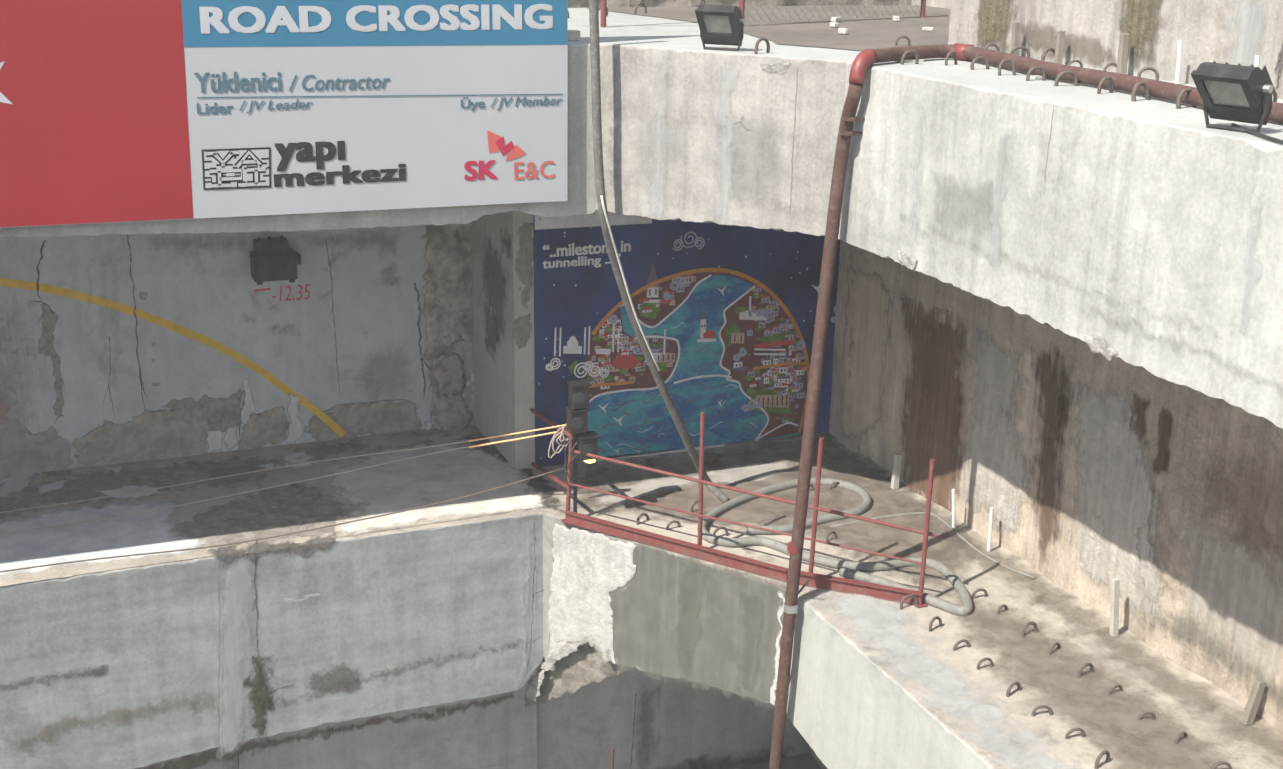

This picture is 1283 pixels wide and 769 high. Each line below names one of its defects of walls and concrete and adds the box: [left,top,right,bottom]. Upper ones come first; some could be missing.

leakage [1020,0,1137,65]
crack [1274,43,1283,89]
crack [34,240,59,315]
crack [83,235,173,437]
spalling [0,222,476,477]
crack [249,539,259,661]
leakage [0,379,564,769]
peeling [524,524,636,707]
leakage [572,268,1283,769]